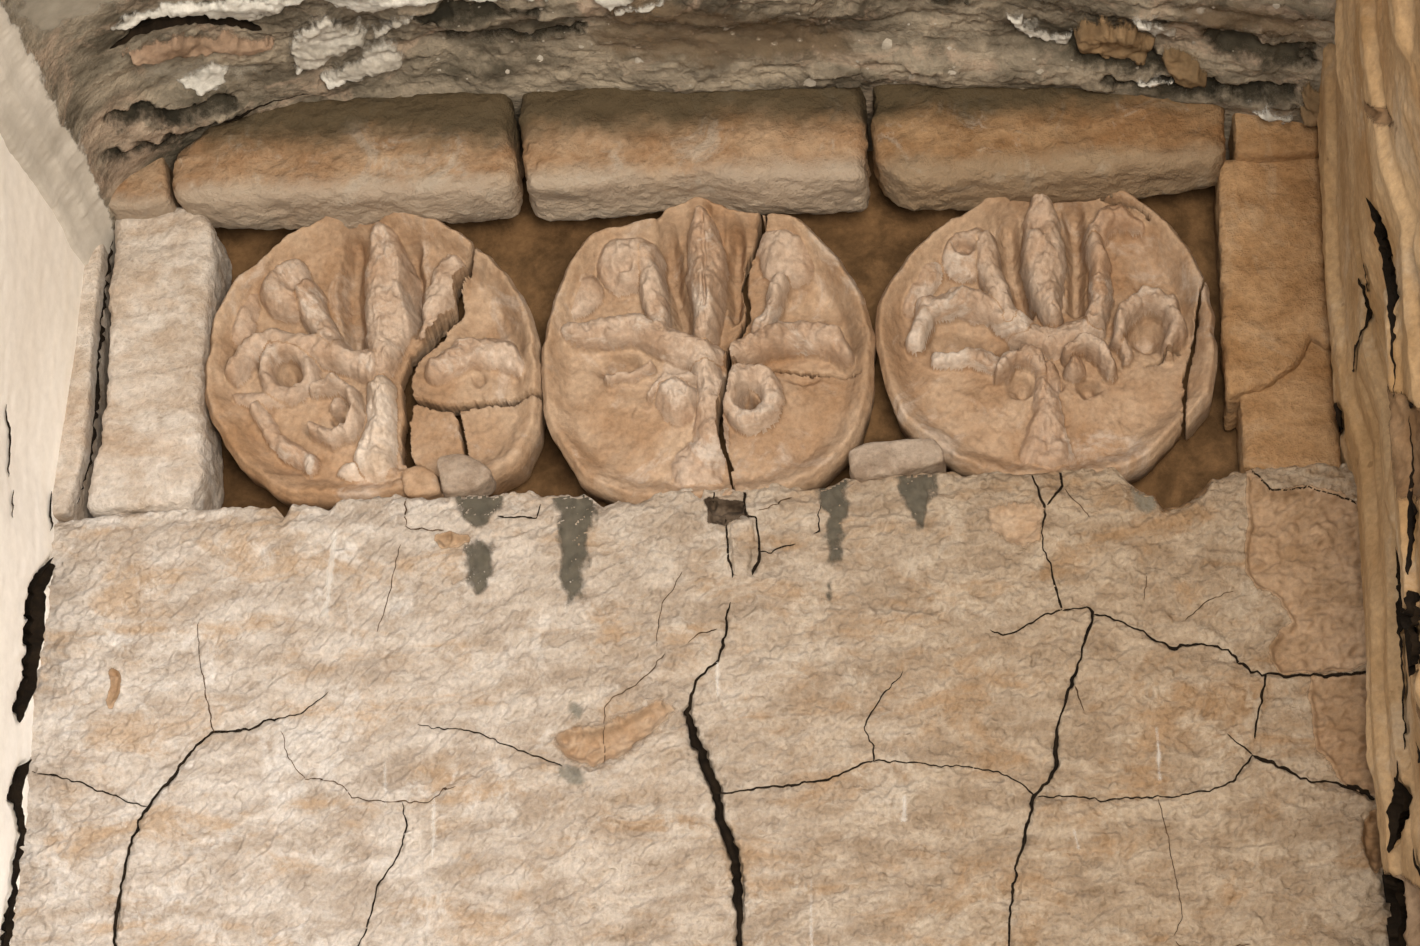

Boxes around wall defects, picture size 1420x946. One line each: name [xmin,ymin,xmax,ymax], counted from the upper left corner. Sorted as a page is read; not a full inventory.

peeling [594,0,664,16]
peeling [104,0,587,159]
peeling [1007,15,1317,124]
crack [5,404,14,517]
crack [12,491,55,723]
water stain [456,495,502,594]
water stain [553,495,597,600]
water stain [819,480,849,562]
water stain [898,474,938,528]
crack [603,198,1420,946]
crack [0,624,456,946]
crack [418,724,562,766]